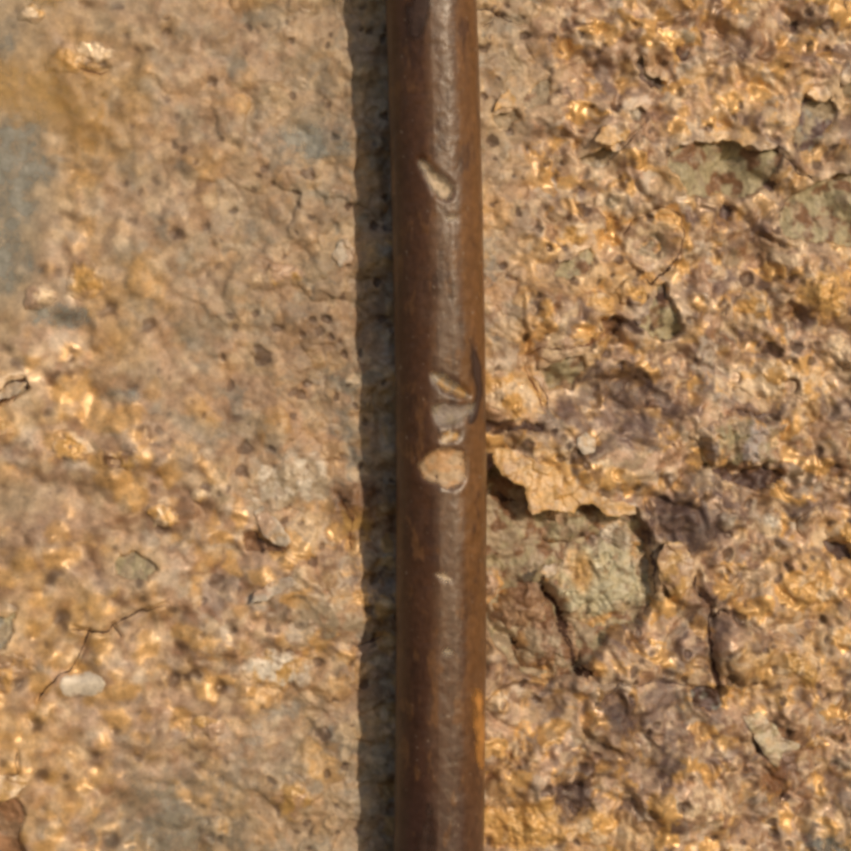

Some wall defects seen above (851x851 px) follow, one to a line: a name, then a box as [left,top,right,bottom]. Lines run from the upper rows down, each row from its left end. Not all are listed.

peeling [667,126,781,221]
peeling [779,161,851,246]
spalling [486,448,695,679]
crack [538,575,687,707]
crack [693,576,730,689]
corrosion [475,691,485,768]